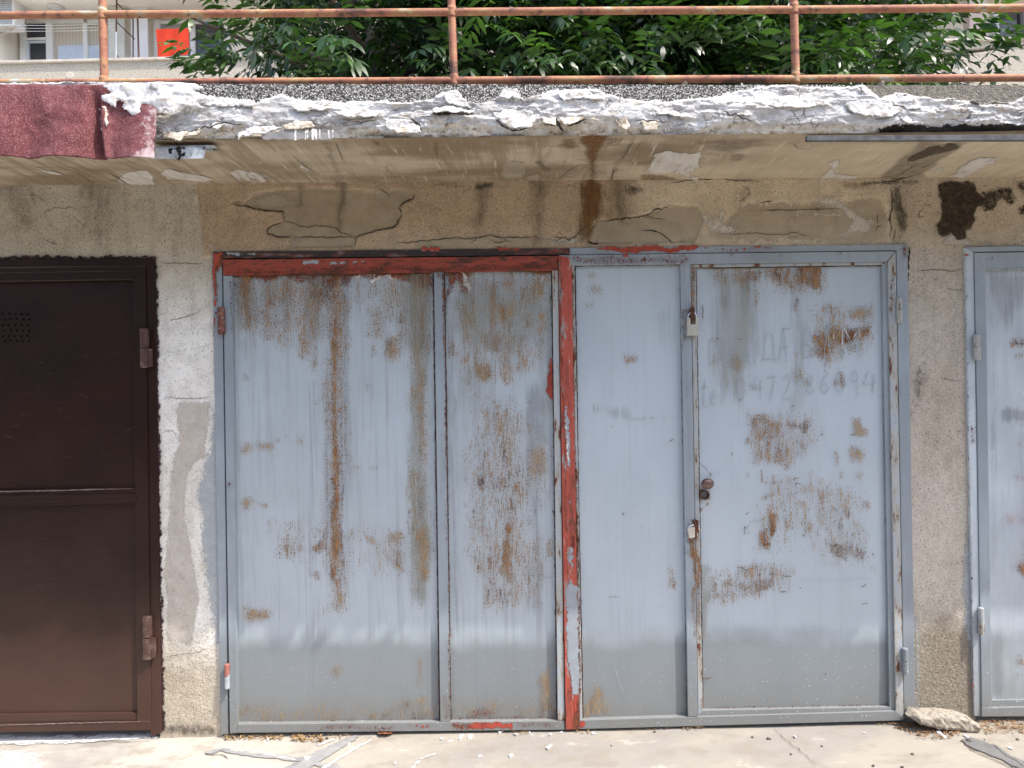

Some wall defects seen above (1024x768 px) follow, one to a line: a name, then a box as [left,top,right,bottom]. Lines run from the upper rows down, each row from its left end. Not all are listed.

peeling [155,83,1024,141]
spalling [230,188,414,248]
spalling [399,205,703,247]
damp [937,181,1024,240]
rust [573,255,874,387]
rust [211,252,557,616]
rust [687,410,870,641]